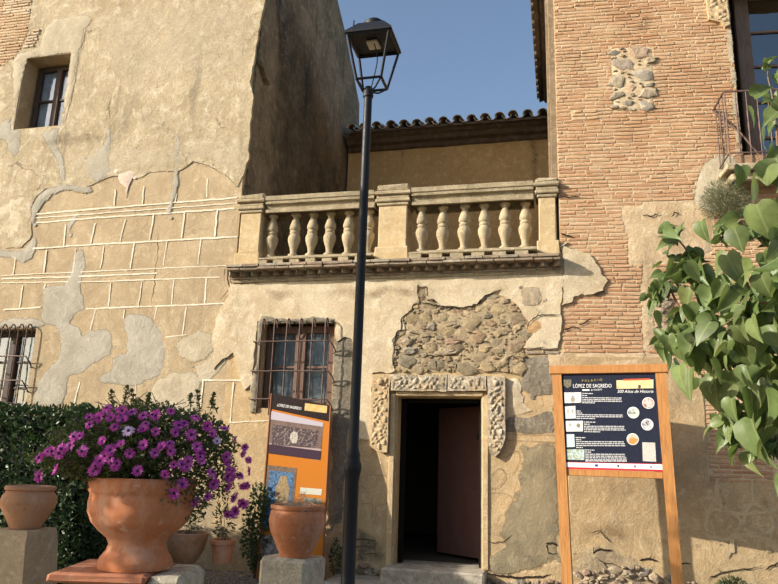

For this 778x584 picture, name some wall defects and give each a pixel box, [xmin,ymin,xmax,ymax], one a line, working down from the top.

peeling [0,183,32,239]
flaking render [486,408,561,574]